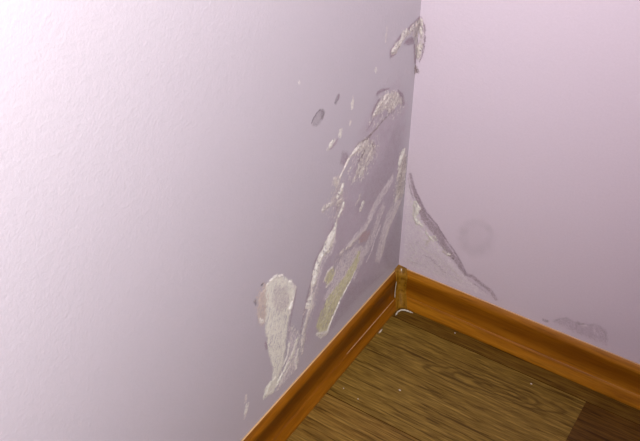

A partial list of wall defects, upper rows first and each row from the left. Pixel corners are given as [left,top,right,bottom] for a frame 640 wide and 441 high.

peeling [389,16,426,74]
spalling [254,87,497,400]